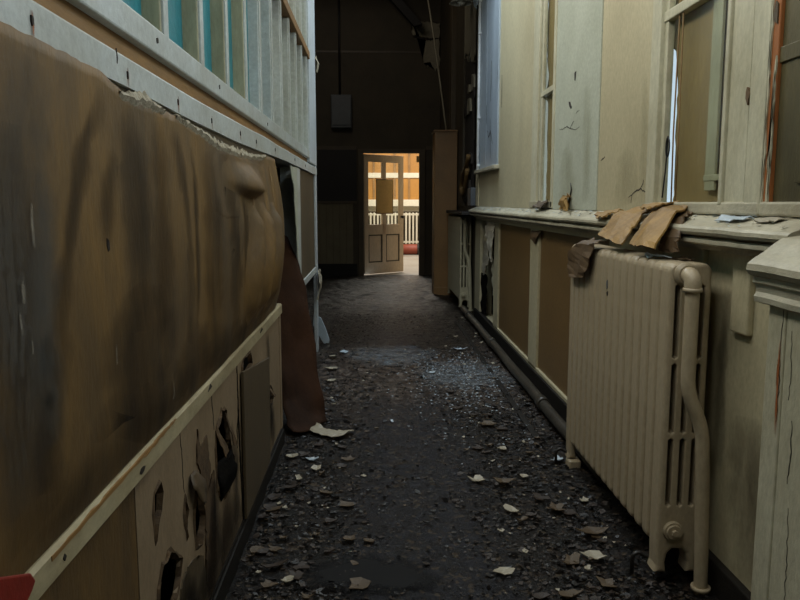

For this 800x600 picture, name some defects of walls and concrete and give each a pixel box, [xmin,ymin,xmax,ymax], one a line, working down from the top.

peeling [119,90,267,160]
crack [776,310,792,483]
peeling [180,428,229,600]
crack [782,516,790,600]